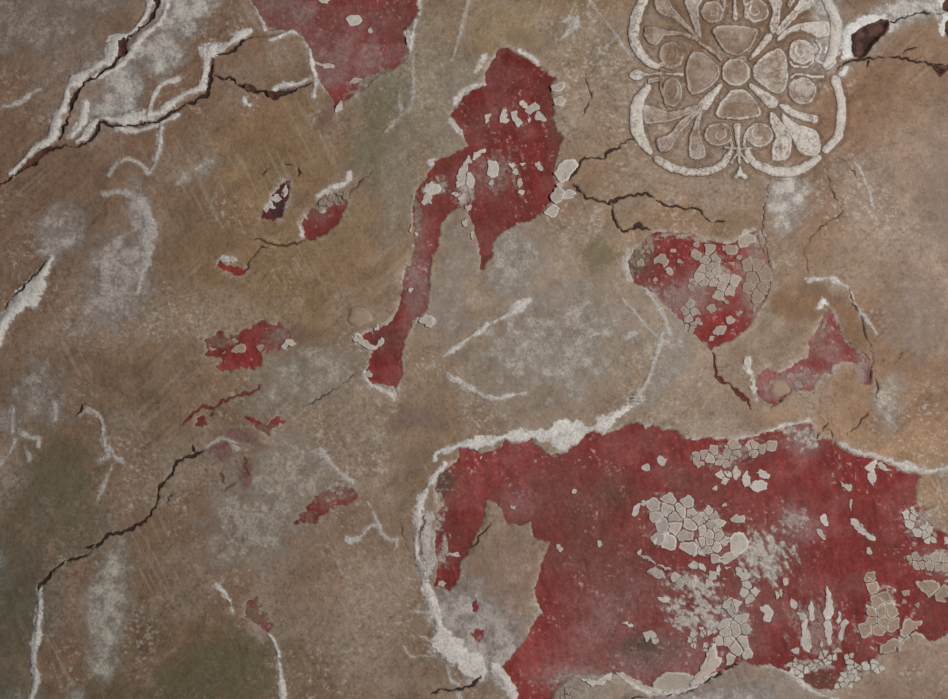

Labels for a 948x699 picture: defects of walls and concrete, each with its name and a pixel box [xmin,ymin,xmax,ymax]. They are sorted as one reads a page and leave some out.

crack [0,0,311,184]
peeling [252,0,422,113]
crack [837,47,948,73]
peeling [352,48,579,402]
crack [569,138,724,233]
peeling [622,228,773,350]
efflorescence [0,361,64,433]
peeling [743,298,871,405]
crack [38,443,248,591]
peeling [412,333,948,699]
leakage [426,536,535,689]
crack [430,675,481,696]